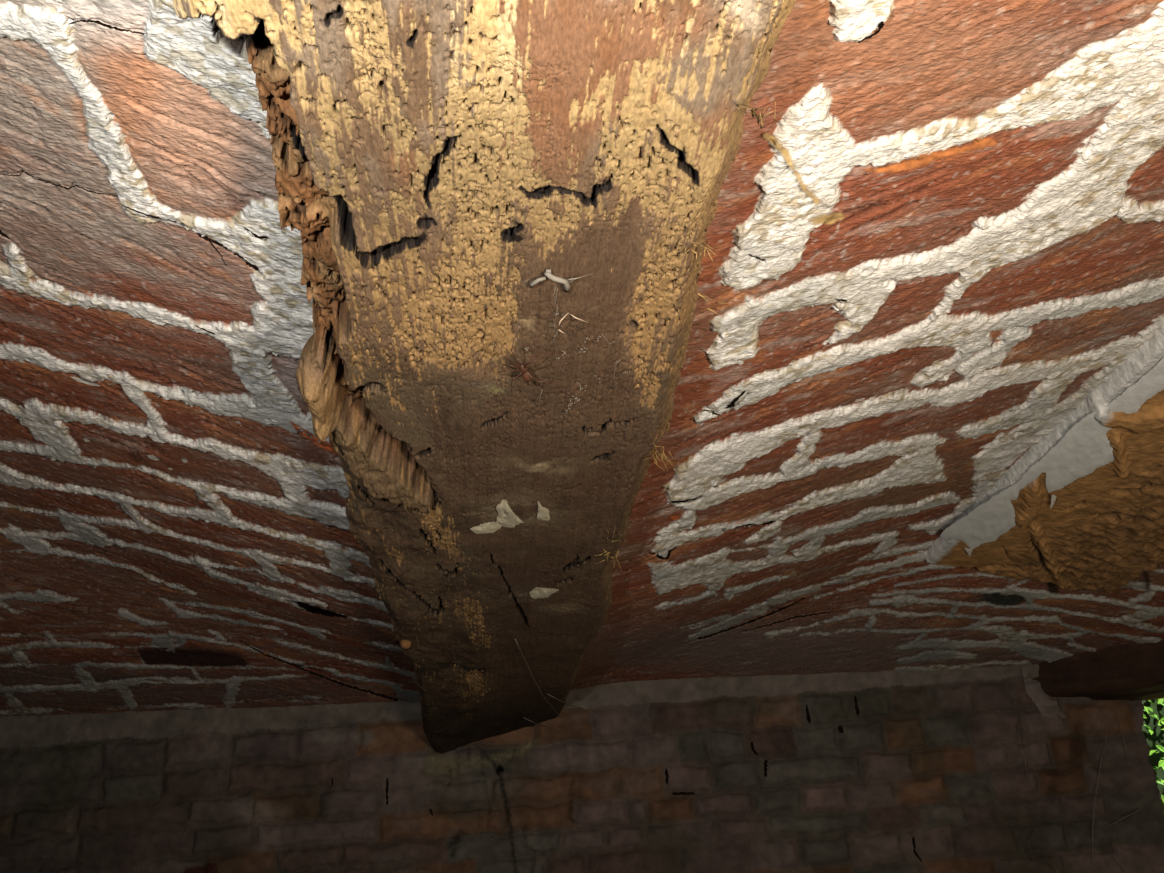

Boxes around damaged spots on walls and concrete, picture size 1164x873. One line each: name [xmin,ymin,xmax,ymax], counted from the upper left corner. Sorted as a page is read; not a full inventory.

crack [0,170,269,274]
peeling [940,357,1164,556]